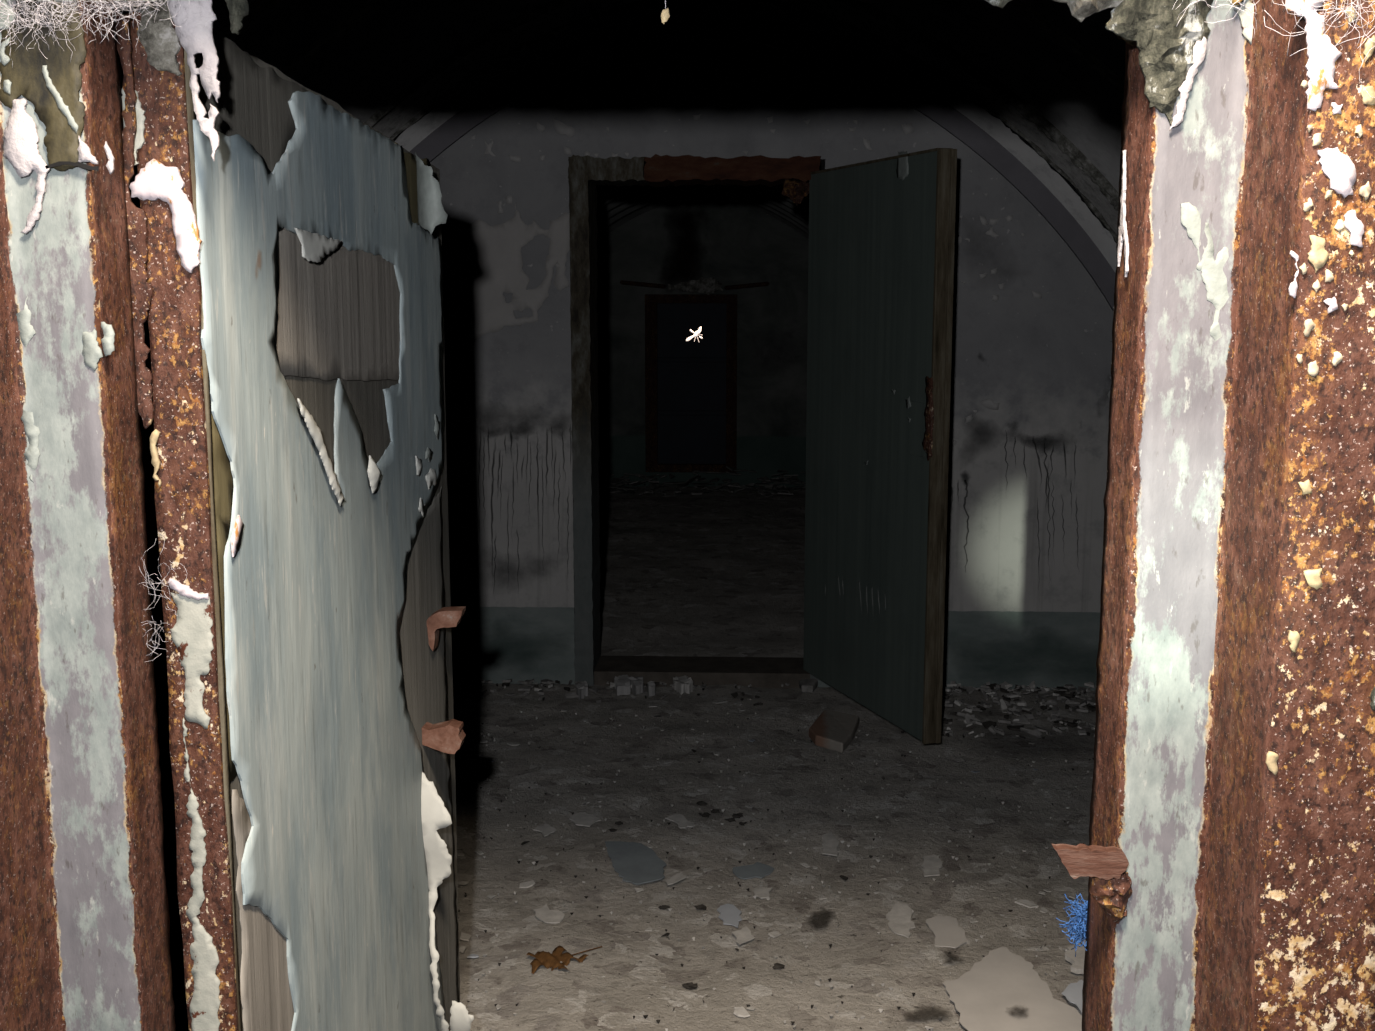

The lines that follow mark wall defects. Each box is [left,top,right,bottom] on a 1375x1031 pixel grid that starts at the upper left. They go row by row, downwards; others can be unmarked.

corrosion [1230,0,1254,45]
peeling [0,0,115,234]
peeling [1169,37,1207,131]
spalling [121,87,202,273]
peeling [16,296,36,350]
peeling [82,322,115,371]
peeling [20,410,40,483]
spalling [231,515,244,557]
damp [1004,439,1078,566]
spalling [168,578,221,1031]